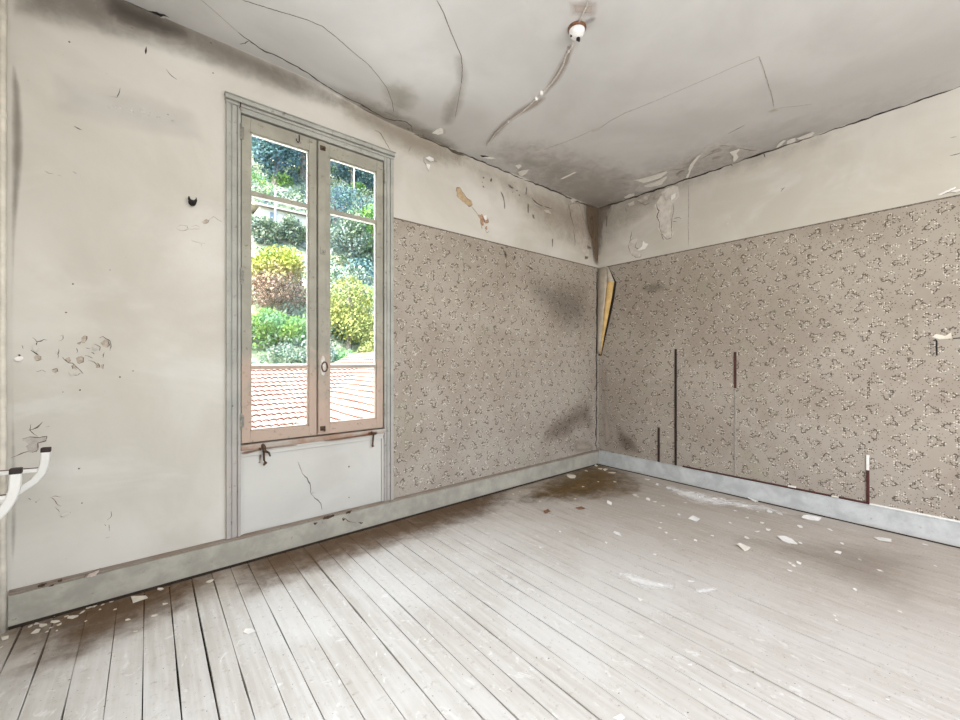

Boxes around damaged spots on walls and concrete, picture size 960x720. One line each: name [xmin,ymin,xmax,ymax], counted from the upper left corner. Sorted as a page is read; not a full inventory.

crack [201,0,960,244]
peeling [606,132,814,241]
spalling [456,187,489,233]
spalling [76,335,111,369]
damp [533,465,630,498]